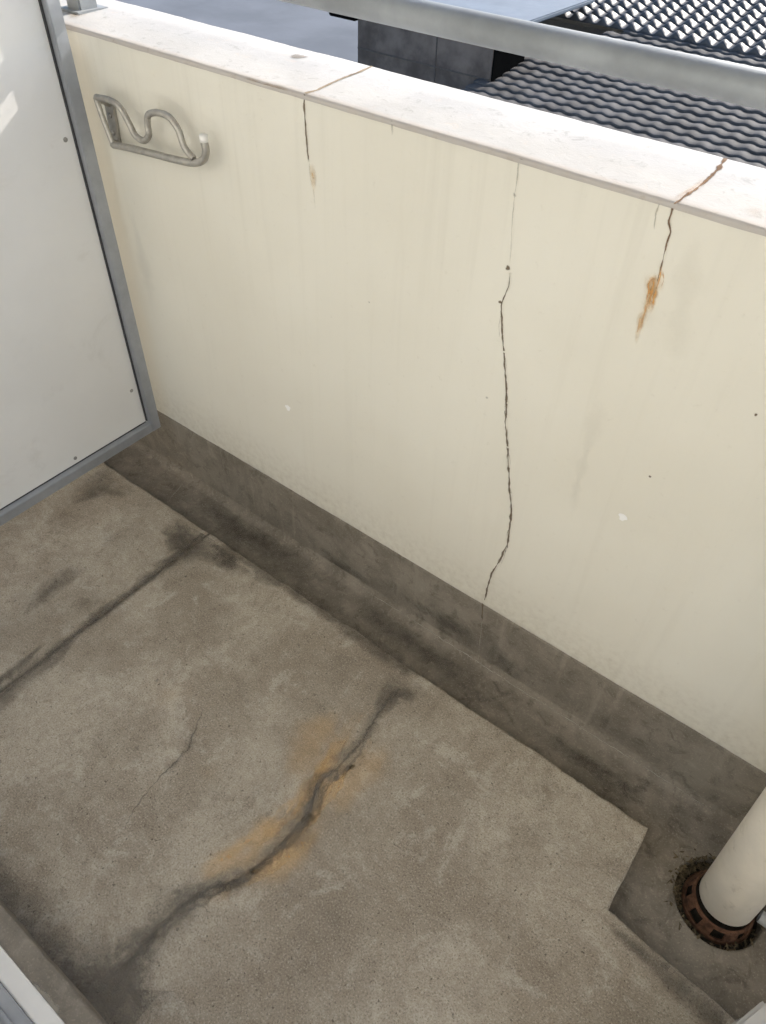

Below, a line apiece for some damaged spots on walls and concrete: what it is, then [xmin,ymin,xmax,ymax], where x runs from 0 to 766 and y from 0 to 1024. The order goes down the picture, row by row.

crack [303,66,373,162]
crack [654,158,727,287]
crack [360,272,703,805]